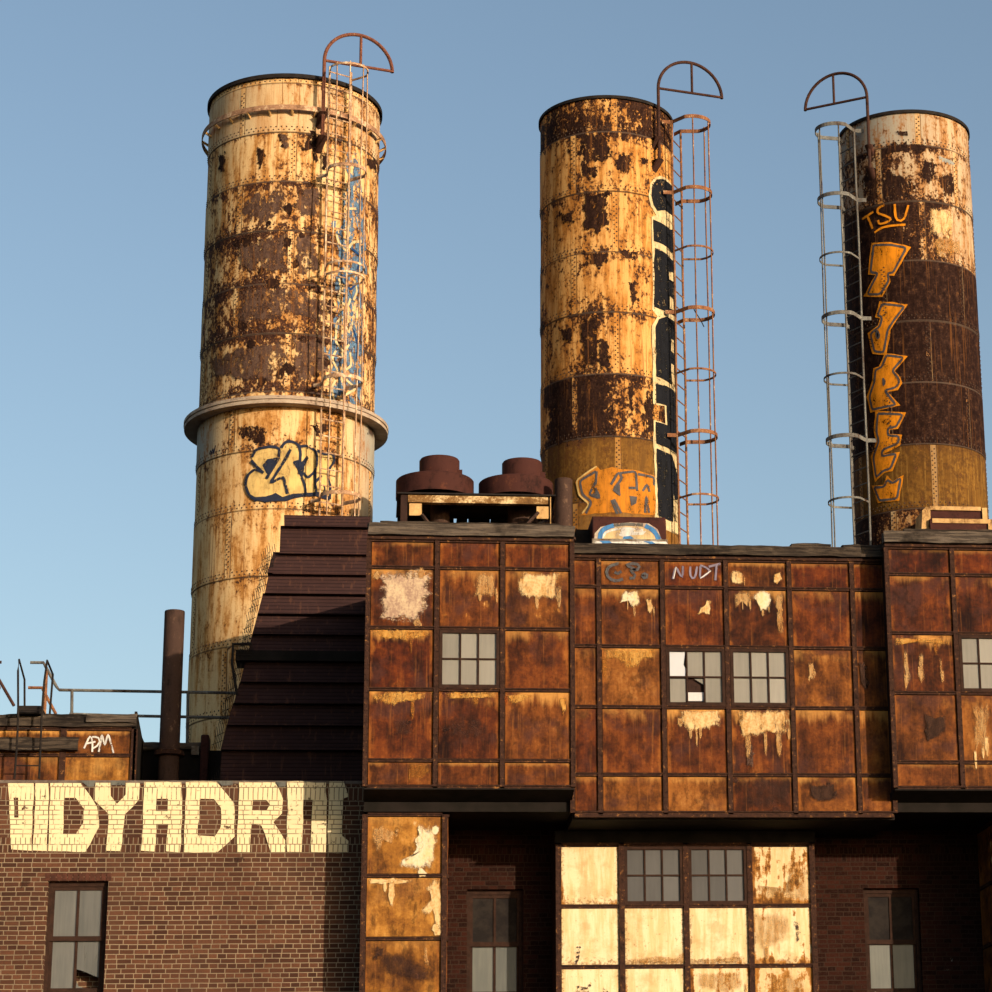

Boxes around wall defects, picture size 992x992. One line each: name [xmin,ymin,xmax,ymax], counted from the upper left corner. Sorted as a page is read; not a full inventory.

rust [567,133,649,180]
rust [857,131,955,201]
rust [559,190,611,234]
rust [206,182,336,386]
rust [551,314,616,446]
rust [628,383,664,439]
peeling [374,568,431,628]
peeling [518,573,561,608]
peeling [732,572,783,629]
peeling [678,710,720,744]
peeling [739,711,791,755]
peeling [402,826,441,935]